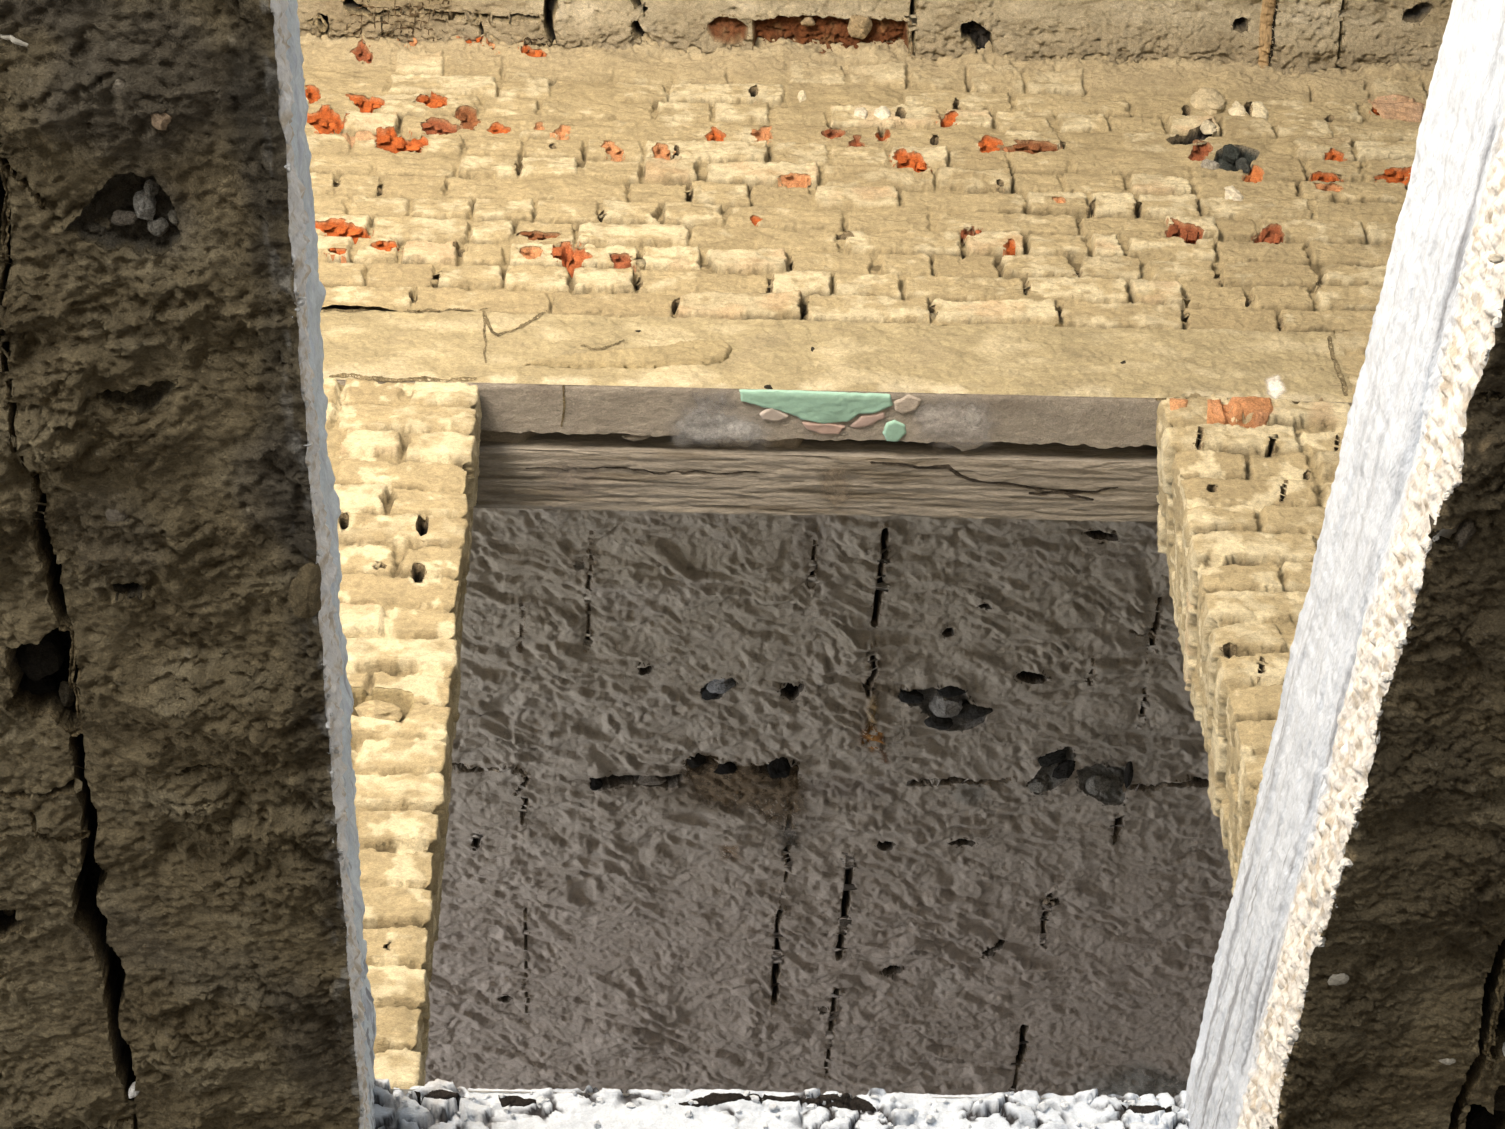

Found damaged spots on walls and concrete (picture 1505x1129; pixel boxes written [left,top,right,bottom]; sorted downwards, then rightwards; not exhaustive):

spalling [703,13,913,58]
crack [1268,2,1278,67]
spalling [64,172,182,256]
crack [1477,392,1503,401]
crack [870,461,1118,500]
crack [0,142,138,1129]
spalling [898,684,993,732]
crack [1448,939,1505,1129]